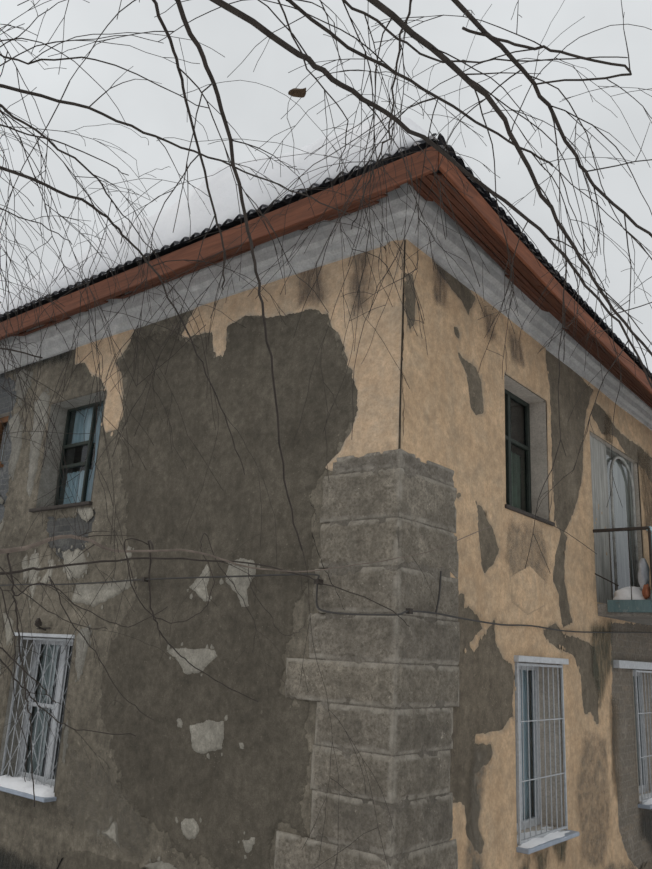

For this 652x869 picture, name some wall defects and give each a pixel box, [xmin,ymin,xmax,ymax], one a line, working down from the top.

spalling [436,264,477,315]
peeling [75,329,135,436]
spalling [453,323,485,418]
flaking render [0,368,50,532]
flaking render [22,506,137,609]
peeling [187,558,260,607]
spalling [475,497,500,573]
spalling [542,350,652,724]
peeling [167,642,217,676]
peeling [177,715,228,759]
spalling [449,593,516,854]
flaking render [611,622,652,869]